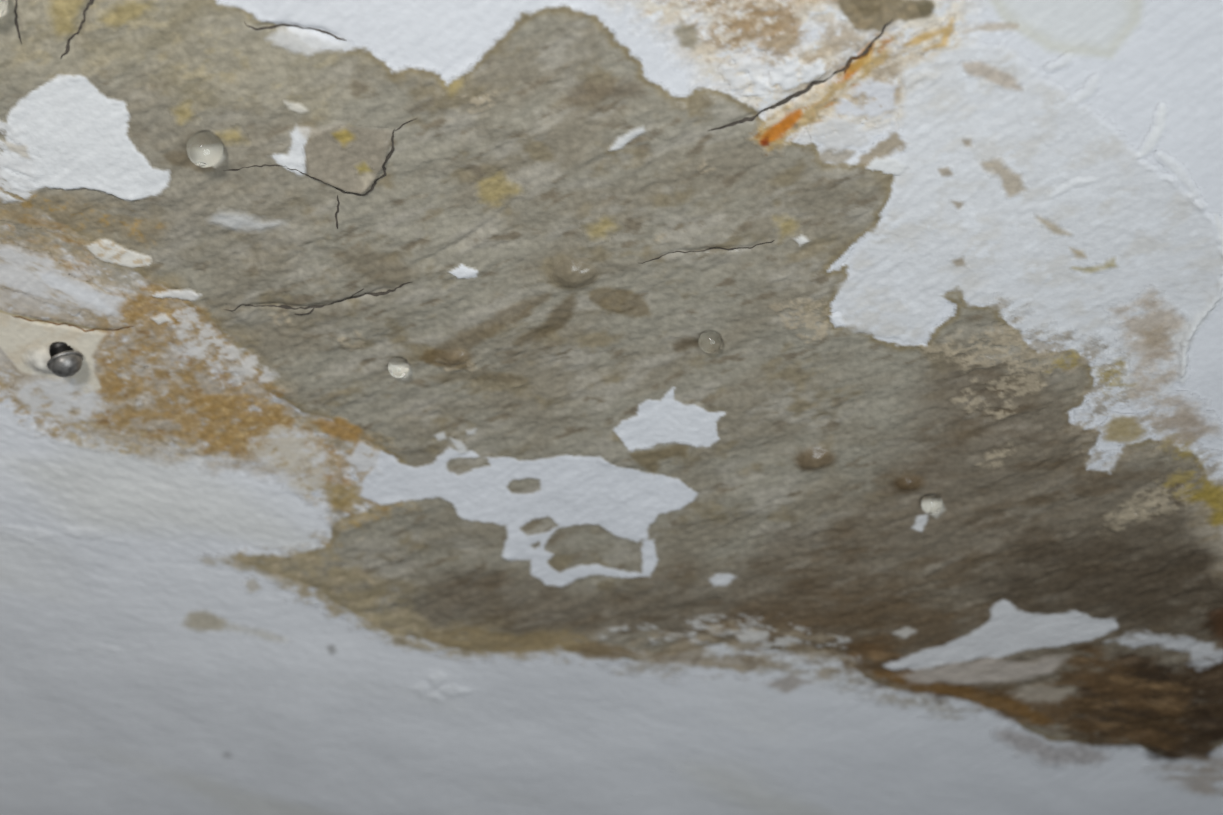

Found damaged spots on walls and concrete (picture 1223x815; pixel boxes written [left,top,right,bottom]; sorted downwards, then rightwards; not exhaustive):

peeling [0,71,173,206]
crack [244,22,347,41]
crack [223,118,417,229]
rust [744,14,959,158]
damp [647,0,1148,76]
peeling [809,37,1223,393]
peeling [0,237,154,428]
peeling [243,386,728,588]
damp [195,542,498,666]
damp [420,621,605,665]
damp [579,616,979,722]
peeling [880,598,1223,707]